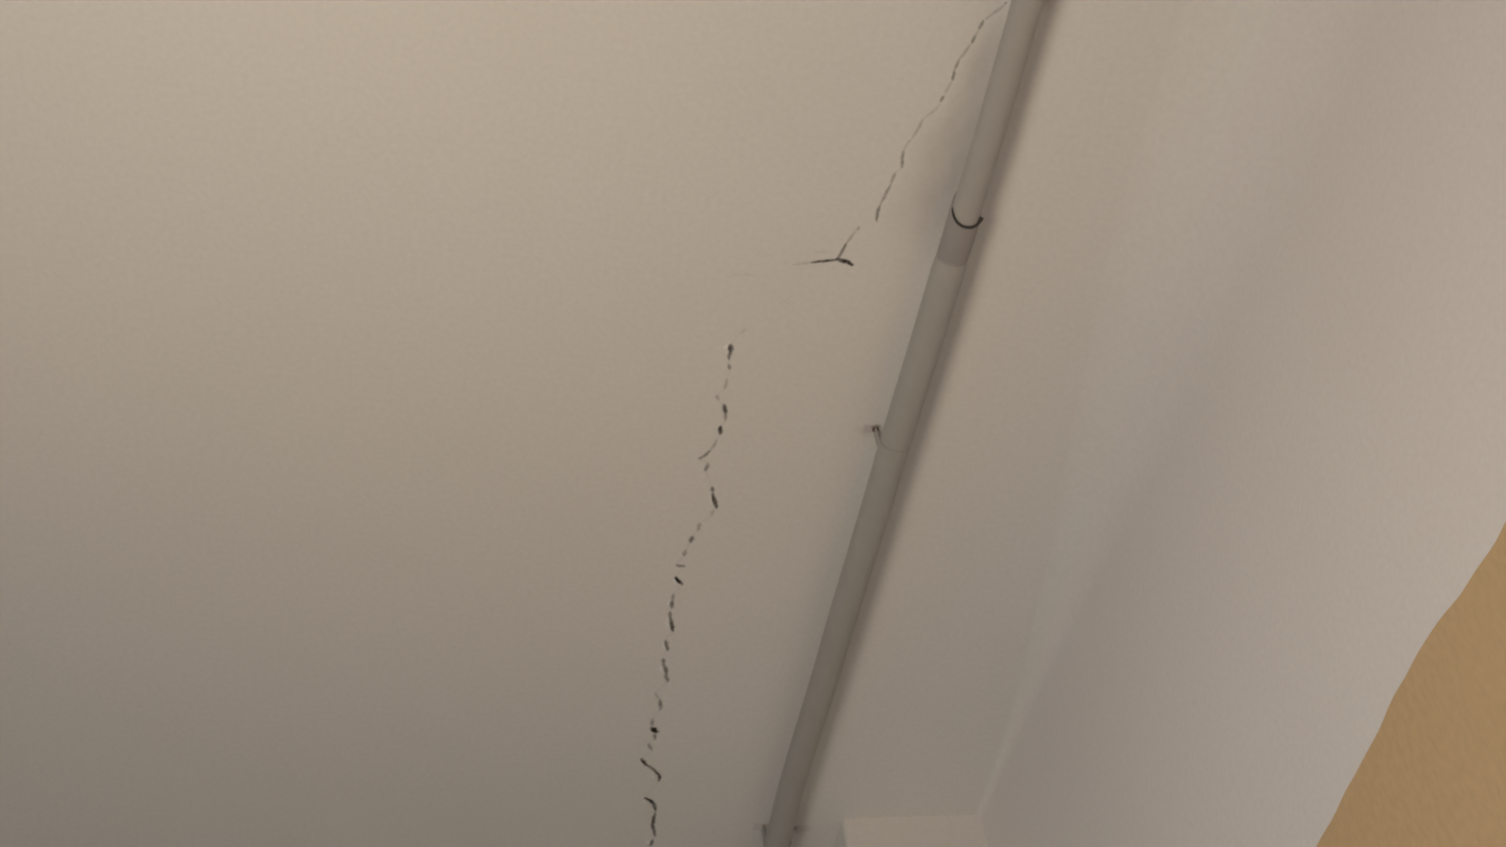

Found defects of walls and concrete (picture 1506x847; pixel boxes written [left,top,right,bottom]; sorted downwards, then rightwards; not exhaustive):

crack [816,258,853,266]
crack [709,494,717,508]
crack [659,577,681,673]
crack [639,727,661,845]